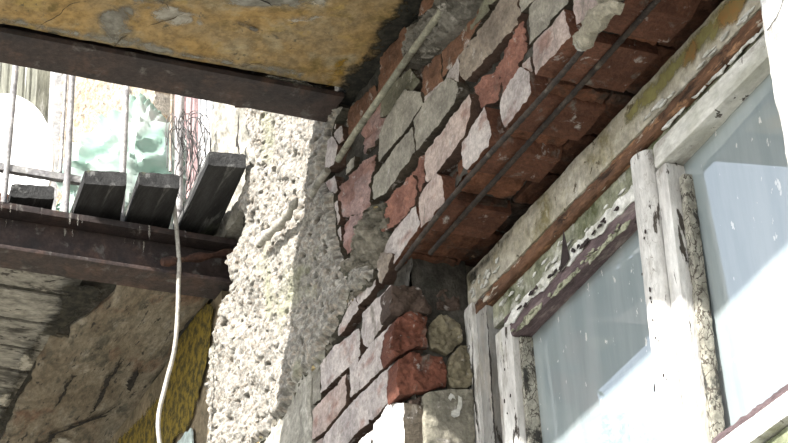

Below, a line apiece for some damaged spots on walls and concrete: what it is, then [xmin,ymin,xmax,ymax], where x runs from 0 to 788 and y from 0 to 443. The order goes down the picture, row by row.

peeling [153,7,202,25]
leakage [338,0,422,106]
leakage [625,0,732,123]
rust [682,40,697,68]
rust [714,0,745,29]
peeling [692,0,782,99]
peeling [643,91,675,121]
peeling [661,107,685,130]
peeling [499,185,636,332]
crack [45,358,139,443]